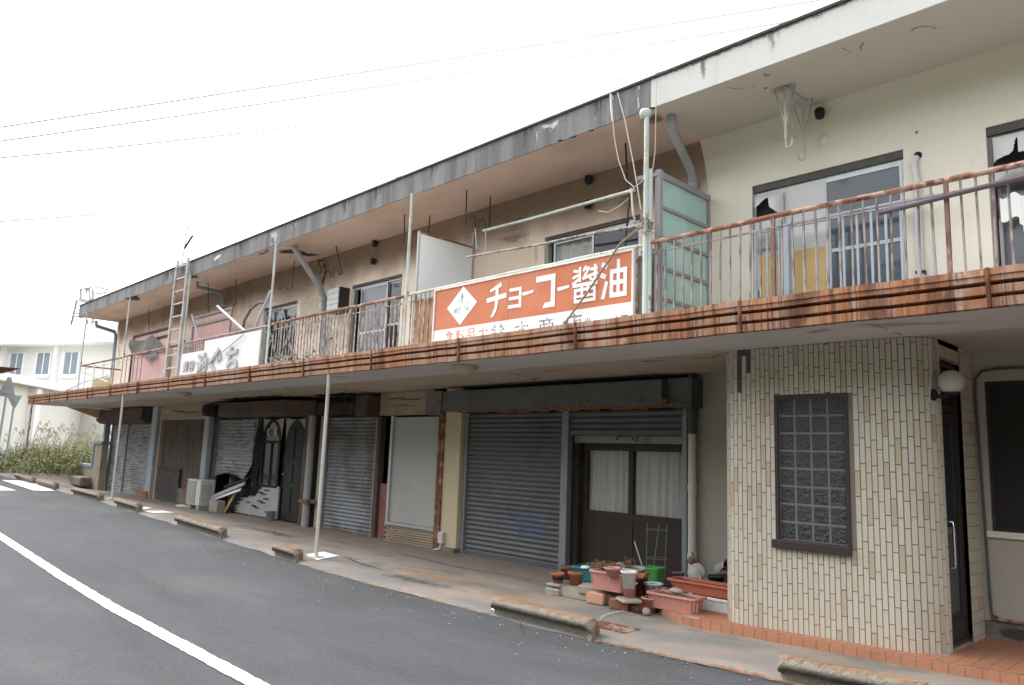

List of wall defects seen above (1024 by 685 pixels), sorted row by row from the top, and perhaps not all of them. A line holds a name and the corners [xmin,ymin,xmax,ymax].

damp [654,0,852,79]
peeling [536,120,576,141]